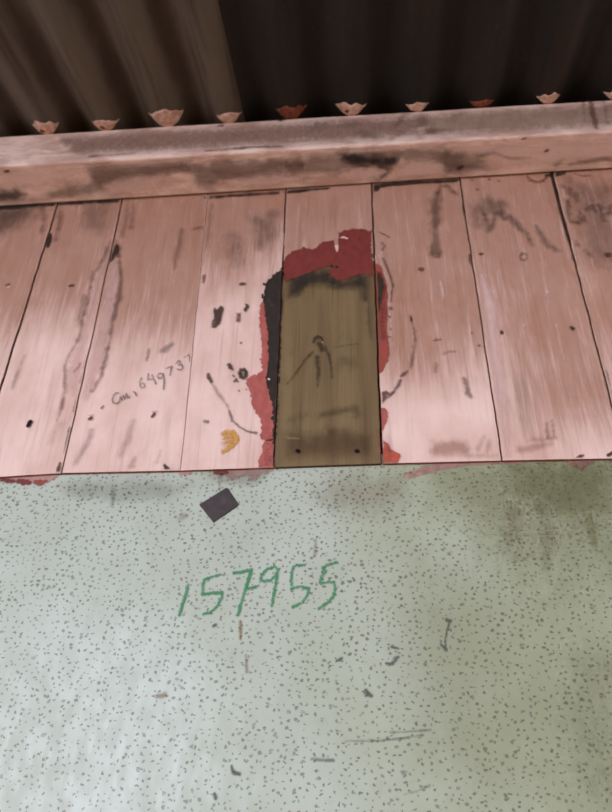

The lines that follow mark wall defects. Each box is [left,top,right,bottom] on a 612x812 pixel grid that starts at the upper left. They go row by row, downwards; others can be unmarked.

damp [342,154,399,178]
peeling [227,228,394,467]
peeling [377,391,401,463]